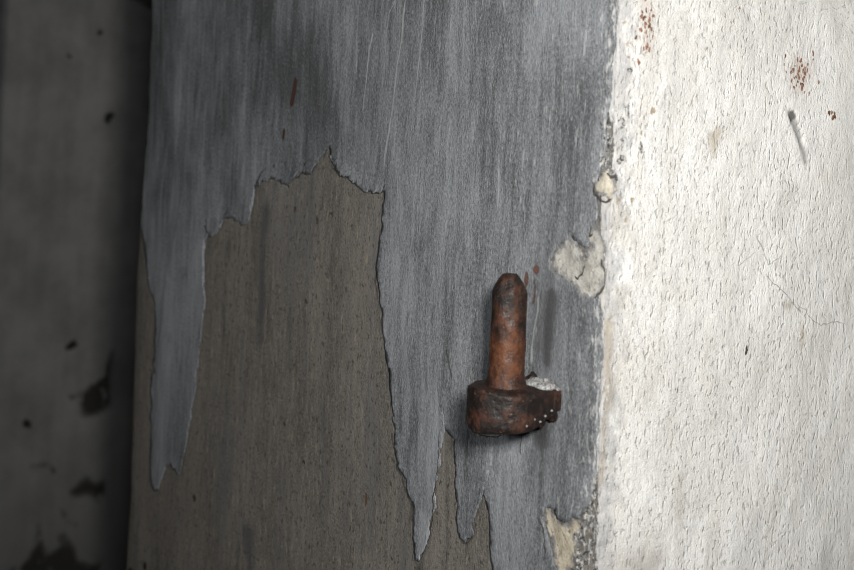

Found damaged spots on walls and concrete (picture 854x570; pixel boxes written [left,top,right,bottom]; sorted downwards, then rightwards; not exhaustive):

corrosion [634,0,655,66]
corrosion [784,51,814,94]
spalling [590,104,634,205]
peeling [550,225,607,299]
crack [738,236,845,325]
peeling [127,146,493,570]
peeling [538,468,601,570]